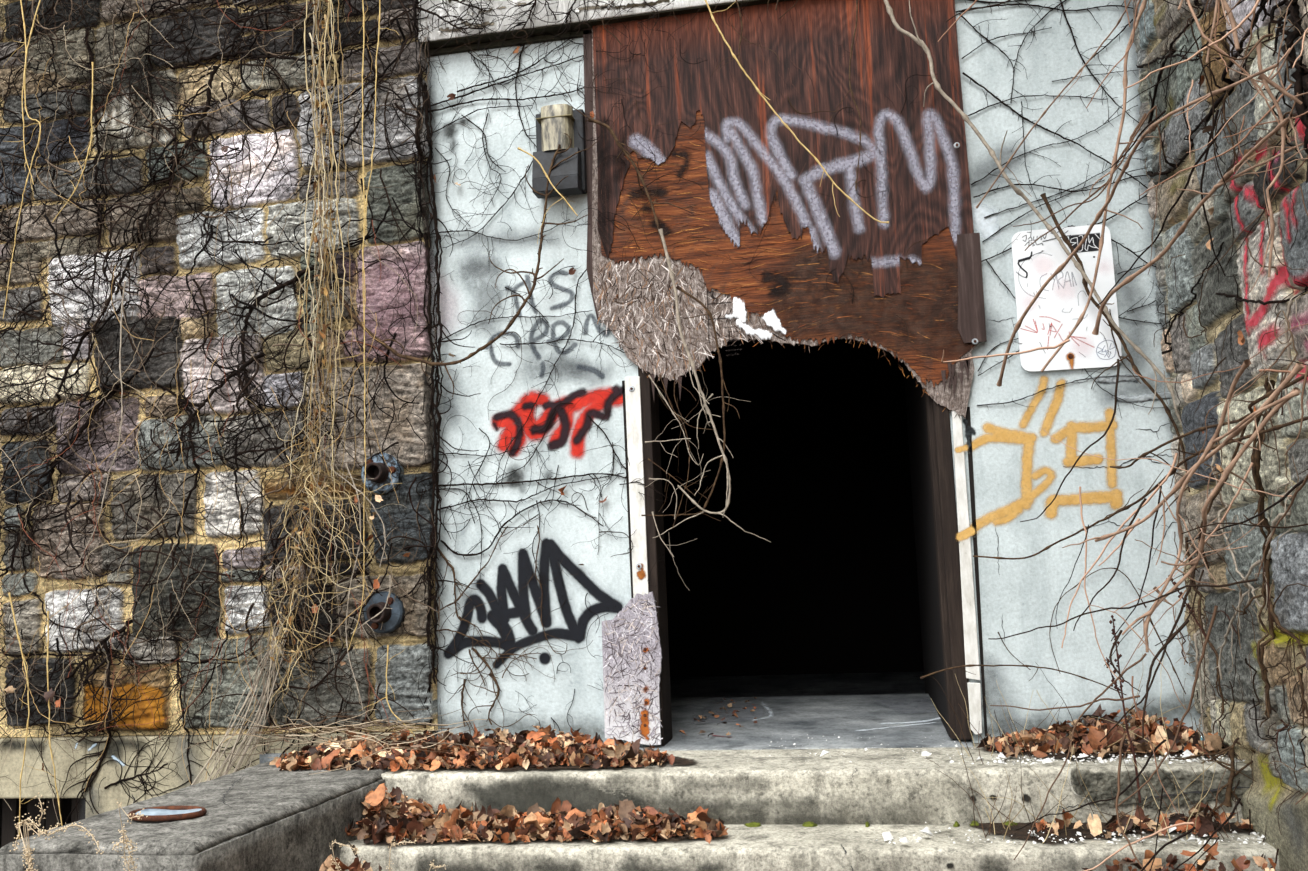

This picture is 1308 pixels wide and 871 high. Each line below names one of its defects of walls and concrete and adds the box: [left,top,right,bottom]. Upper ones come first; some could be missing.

peeling [438,2,526,35]
peeling [575,0,670,13]
peeling [725,297,786,339]
rust [640,686,650,740]